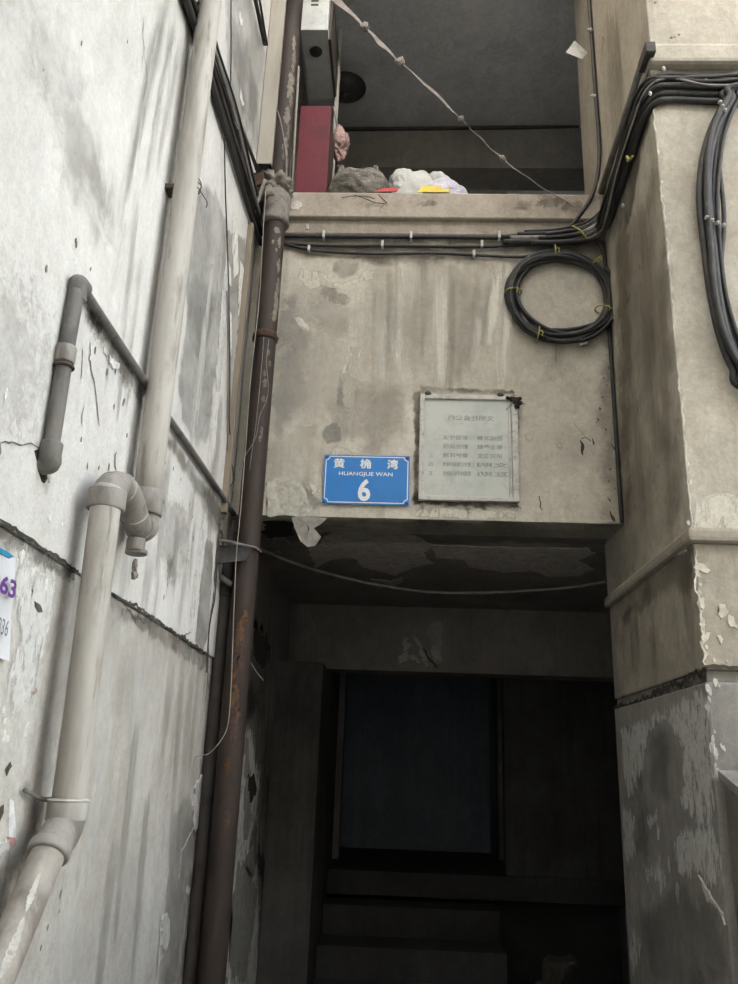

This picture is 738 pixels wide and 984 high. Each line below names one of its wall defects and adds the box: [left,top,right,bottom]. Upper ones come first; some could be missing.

crack [81,342,99,428]
damp [179,193,226,439]
damp [435,279,447,384]
damp [475,272,512,380]
flaking render [260,475,595,589]
damp [195,585,207,648]
flaking render [674,549,728,665]
flaking render [717,603,738,629]
corrosion [224,610,248,775]
flaking render [0,799,16,856]
damp [165,821,195,984]
flaking render [225,725,273,984]